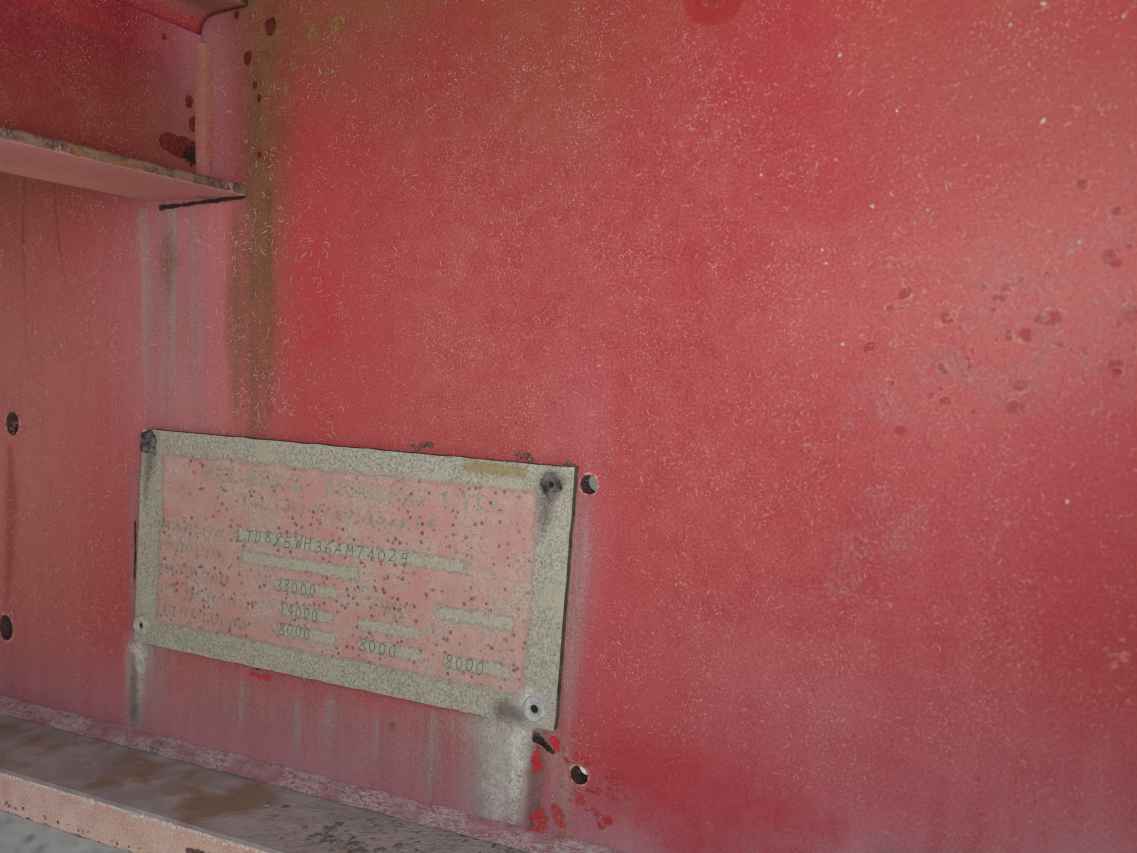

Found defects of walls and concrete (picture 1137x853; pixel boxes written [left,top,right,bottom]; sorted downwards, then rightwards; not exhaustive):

corrosion [264,17,277,36]
peeling [530,730,561,774]
peeling [528,803,566,834]